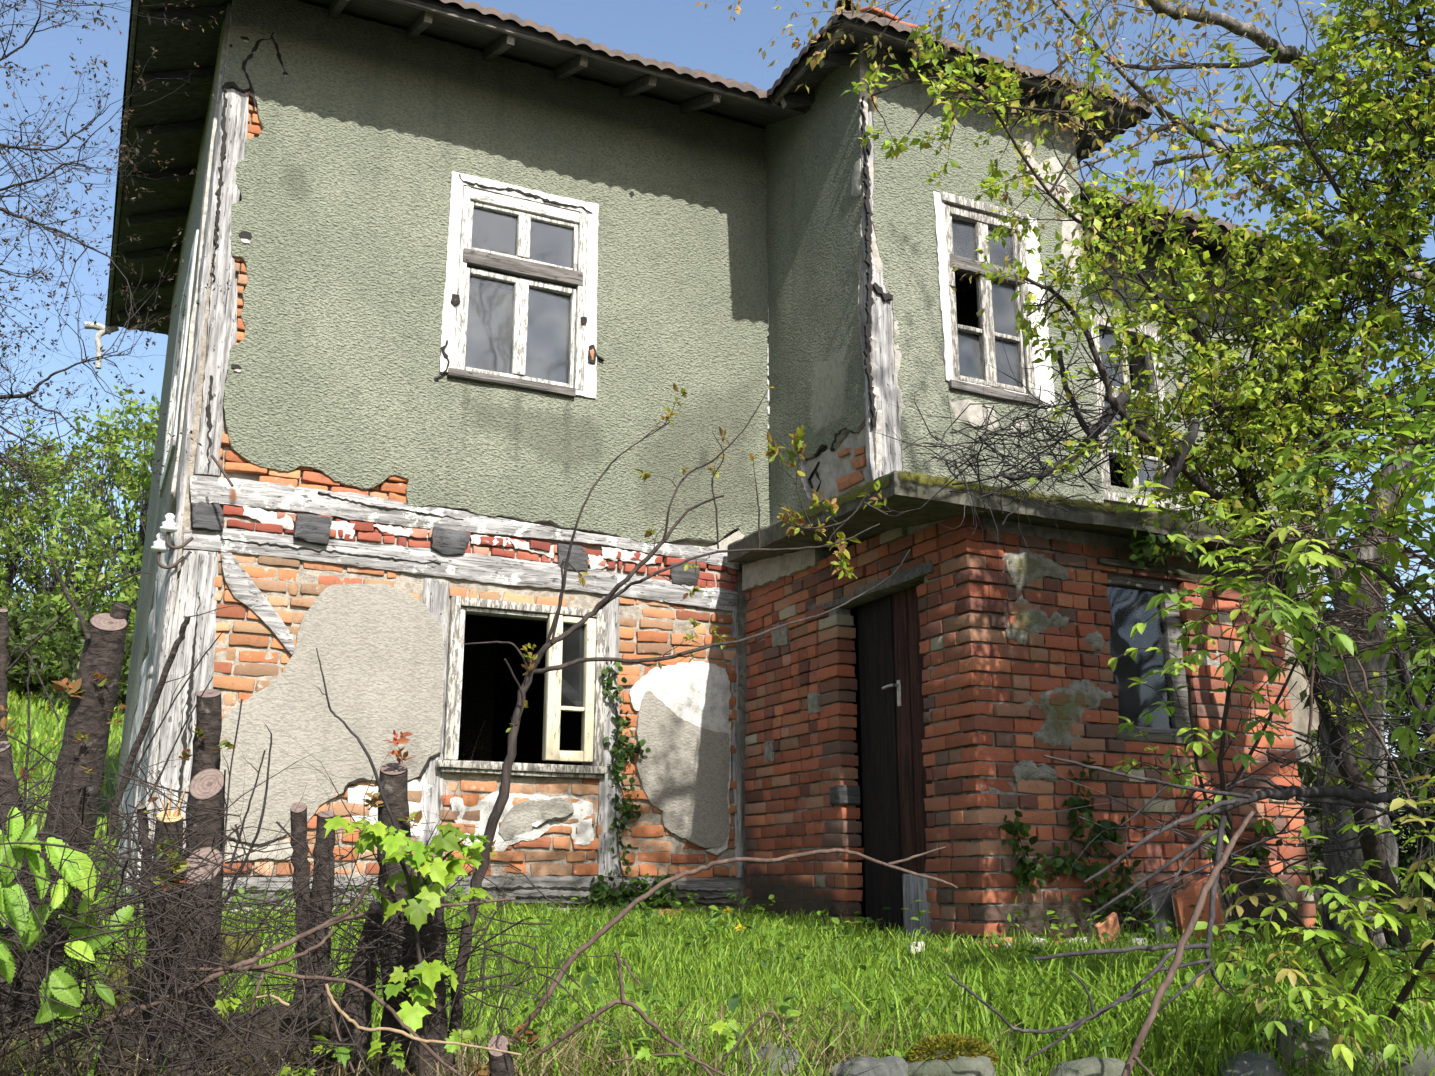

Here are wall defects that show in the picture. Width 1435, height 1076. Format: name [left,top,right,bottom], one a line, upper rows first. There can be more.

spalling [239,231,252,243]
crack [211,32,286,282]
spalling [805,217,905,503]
spalling [851,158,874,197]